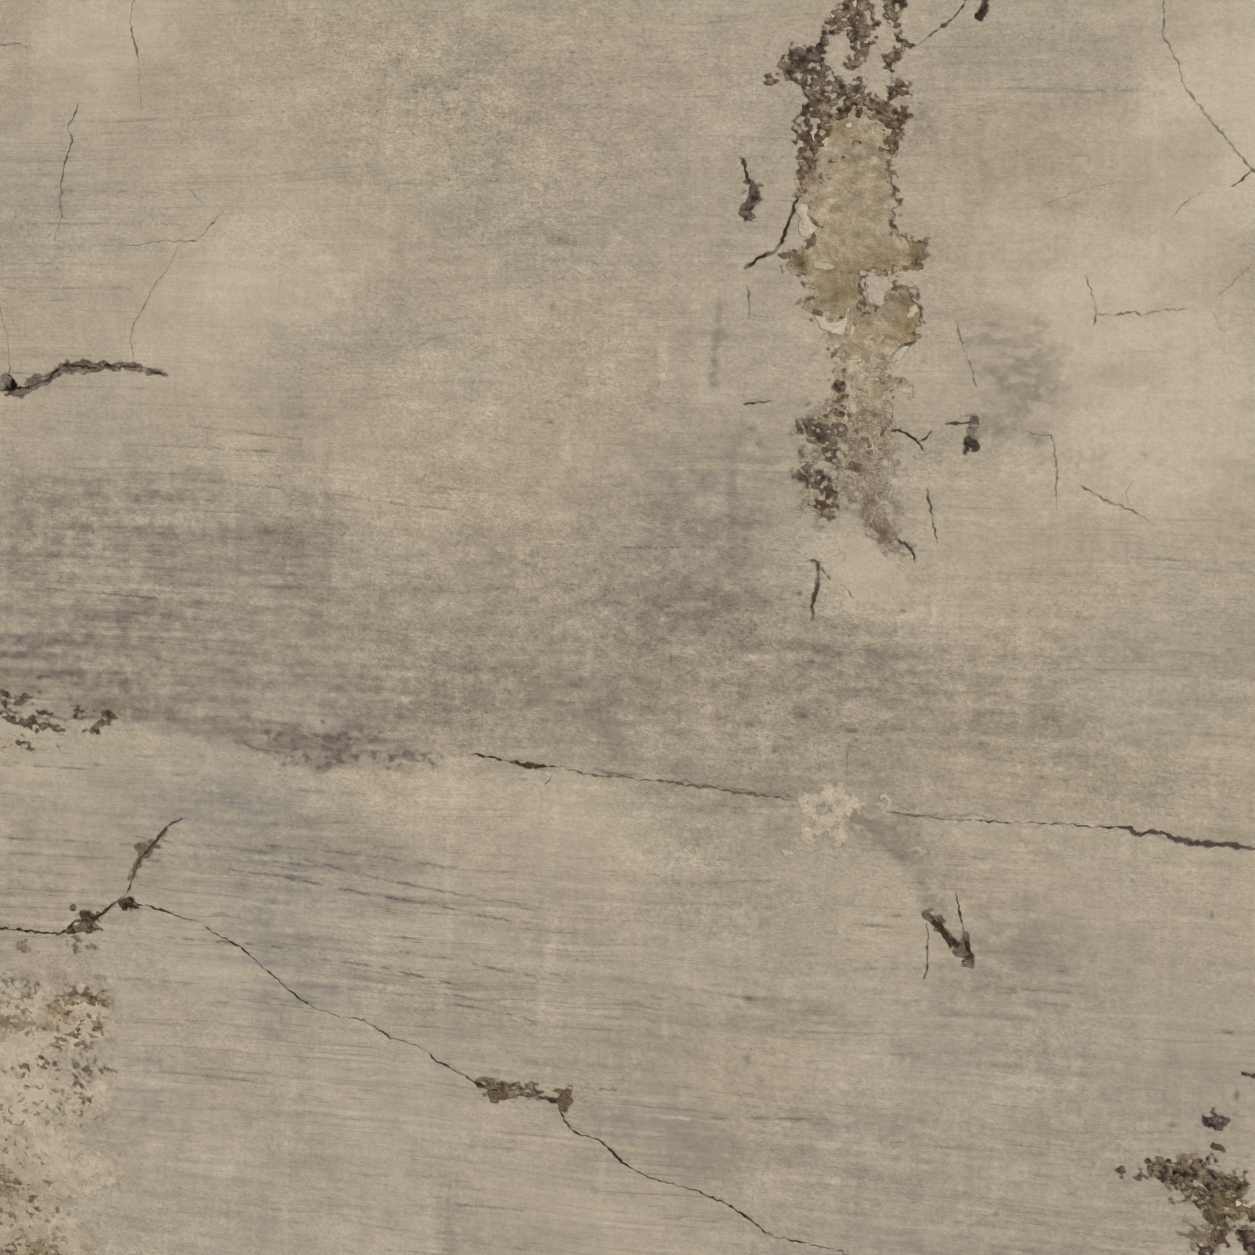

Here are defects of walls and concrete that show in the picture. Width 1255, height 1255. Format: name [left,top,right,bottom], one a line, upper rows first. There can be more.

peeling [739,180,763,221]
peeling [764,0,929,556]
crack [4,364,162,391]
peeling [0,690,65,750]
crack [476,753,783,799]
crack [1040,823,1255,850]
crack [0,818,182,935]
crack [207,928,308,1004]
spalling [922,910,974,968]
spalling [0,904,140,1255]
crack [430,1055,818,1246]
peeling [1115,1108,1255,1255]